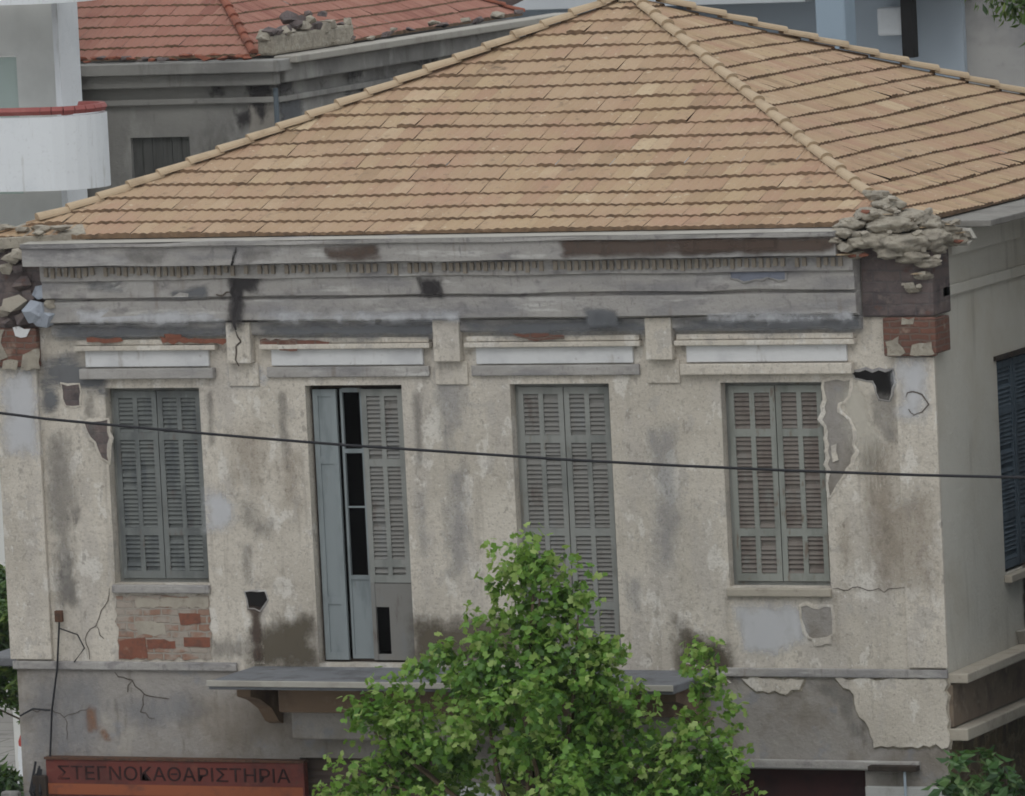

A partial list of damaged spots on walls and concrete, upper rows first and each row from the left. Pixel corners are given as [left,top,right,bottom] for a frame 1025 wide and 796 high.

spalling [0,215,86,371]
spalling [60,382,82,409]
peeling [817,315,951,499]
peeling [83,417,114,465]
crack [85,588,110,659]
flaking render [115,594,212,661]
leakage [248,616,316,667]
leakage [412,620,519,660]
peeling [798,601,837,646]
crack [115,673,169,719]
peeling [686,662,806,697]
peeling [834,676,953,751]